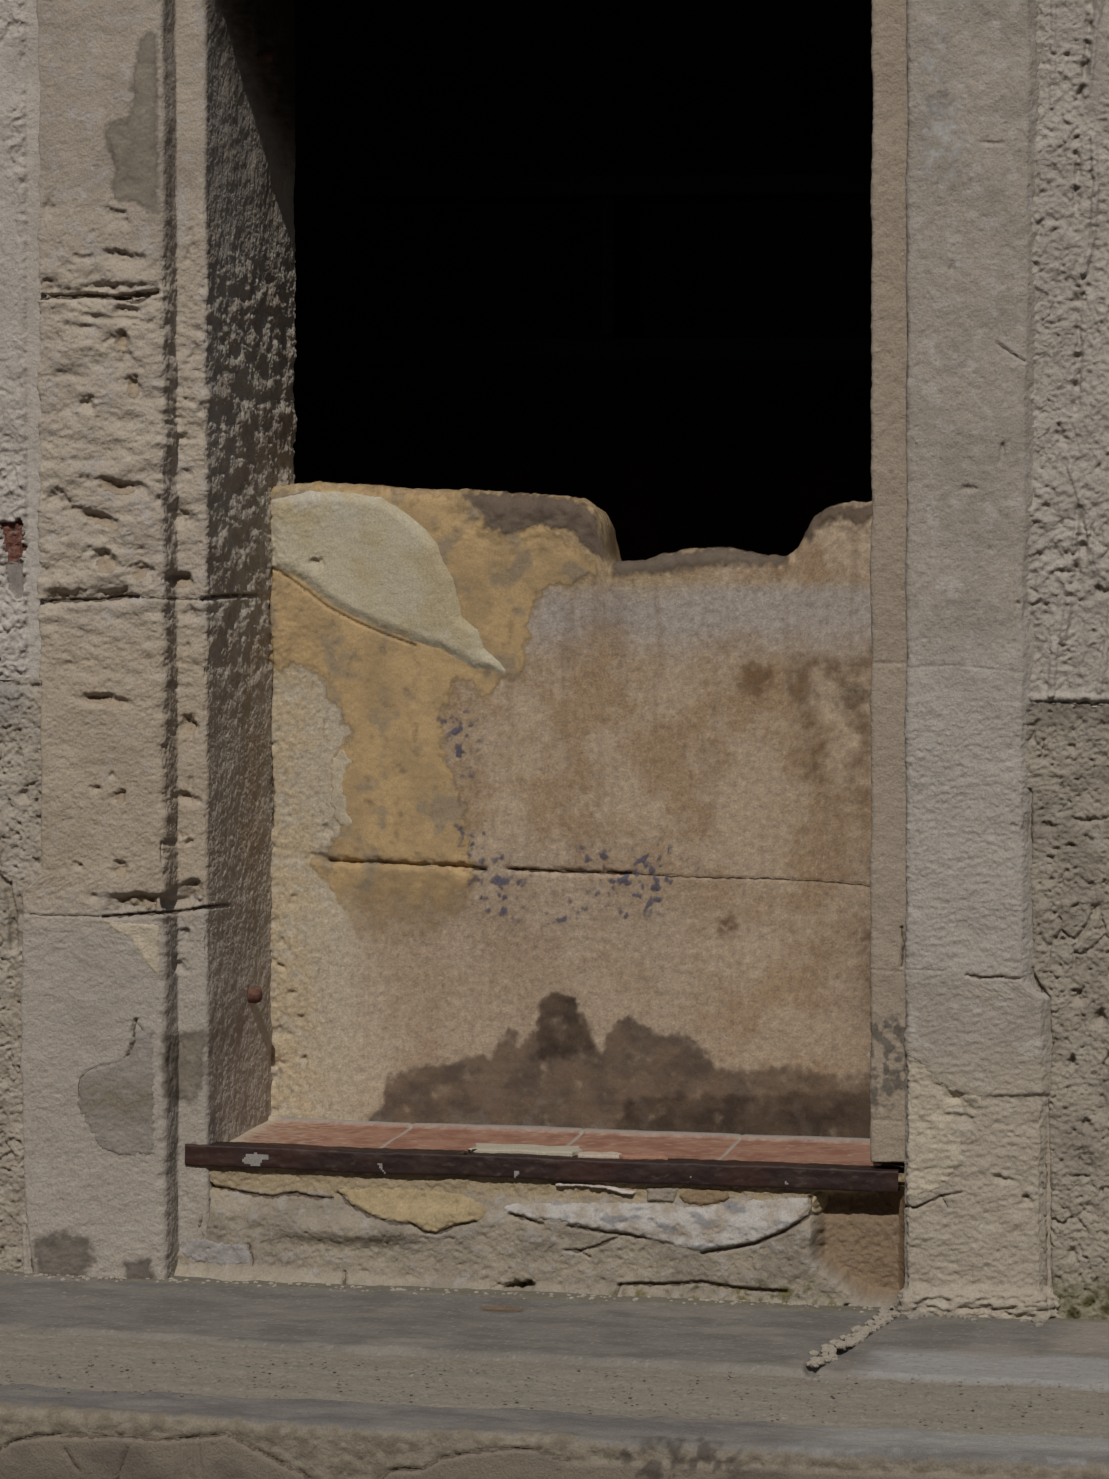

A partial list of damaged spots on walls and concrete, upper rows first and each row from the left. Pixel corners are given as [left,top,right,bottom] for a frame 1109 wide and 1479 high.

flaking render [0,519,27,599]
peeling [268,481,605,918]
crack [339,860,870,887]
damp [369,993,905,1138]
crack [213,1185,476,1234]
crack [511,1213,646,1258]
crack [616,1199,813,1295]